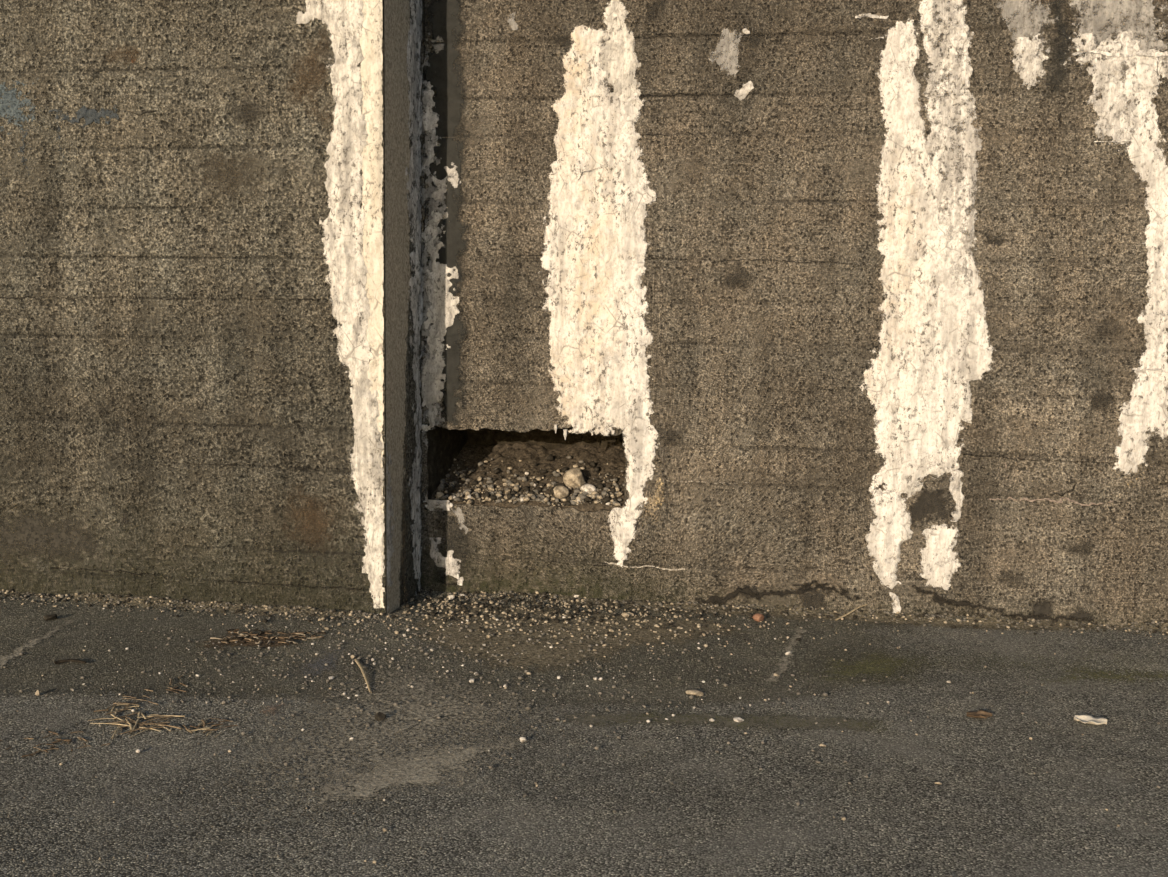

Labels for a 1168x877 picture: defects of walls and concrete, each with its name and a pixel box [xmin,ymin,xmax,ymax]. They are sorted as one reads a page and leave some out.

damp [296,0,385,609]
damp [405,0,469,595]
damp [538,0,698,571]
damp [855,0,996,613]
damp [995,0,1168,475]